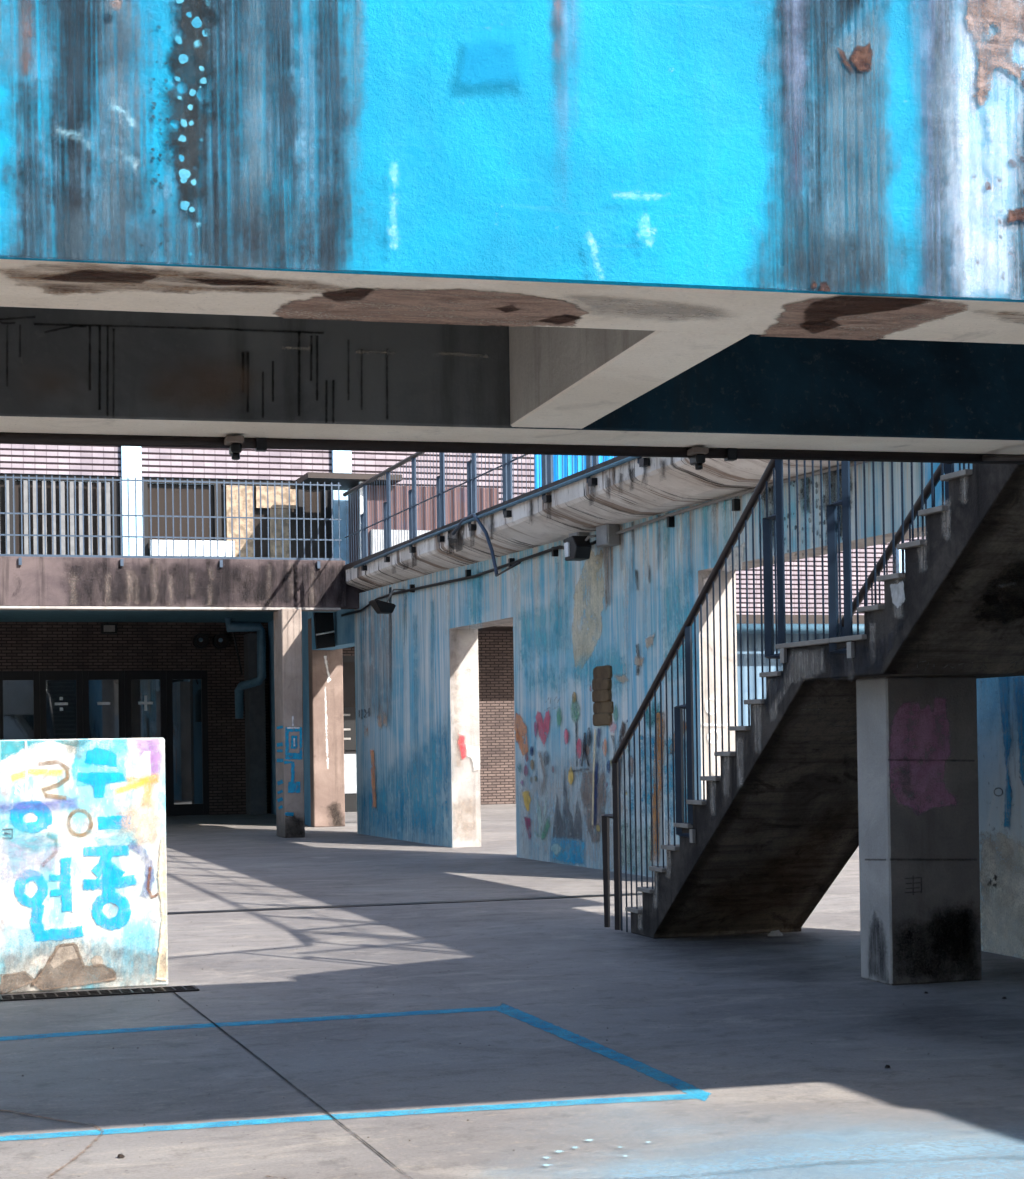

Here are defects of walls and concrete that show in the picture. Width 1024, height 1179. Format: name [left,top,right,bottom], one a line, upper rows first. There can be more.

peeling [966,0,1024,106]
damp [16,0,363,271]
damp [762,0,892,293]
peeling [998,147,1024,295]
damp [869,909,978,983]